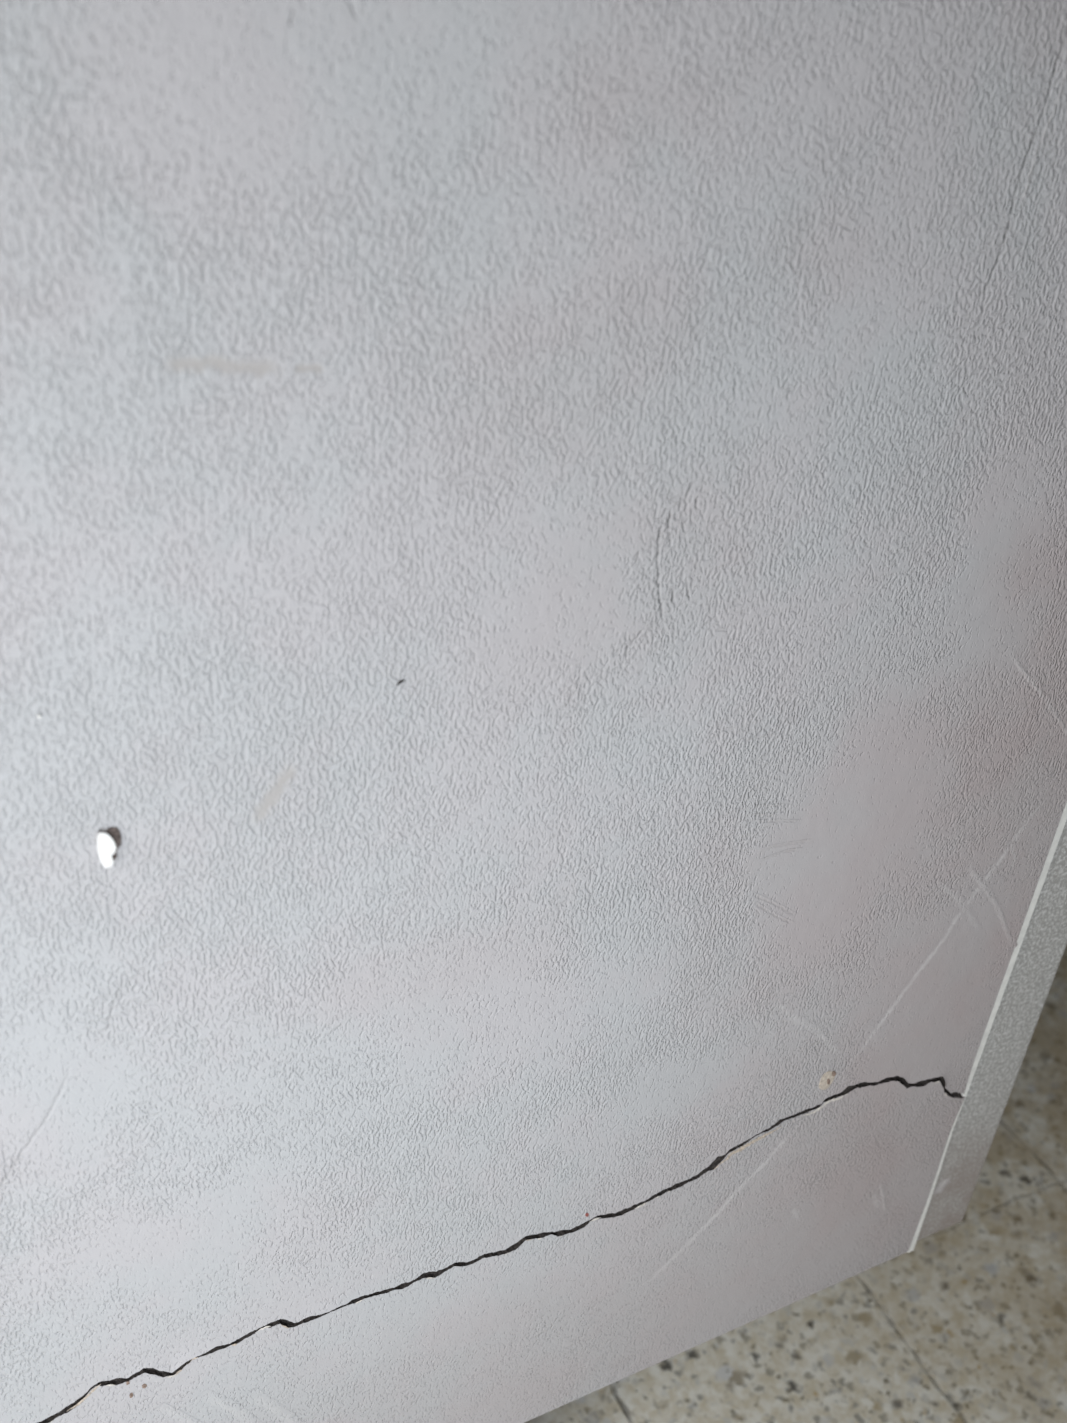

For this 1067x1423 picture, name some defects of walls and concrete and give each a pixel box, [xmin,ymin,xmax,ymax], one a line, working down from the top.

crack [38,1076,963,1423]